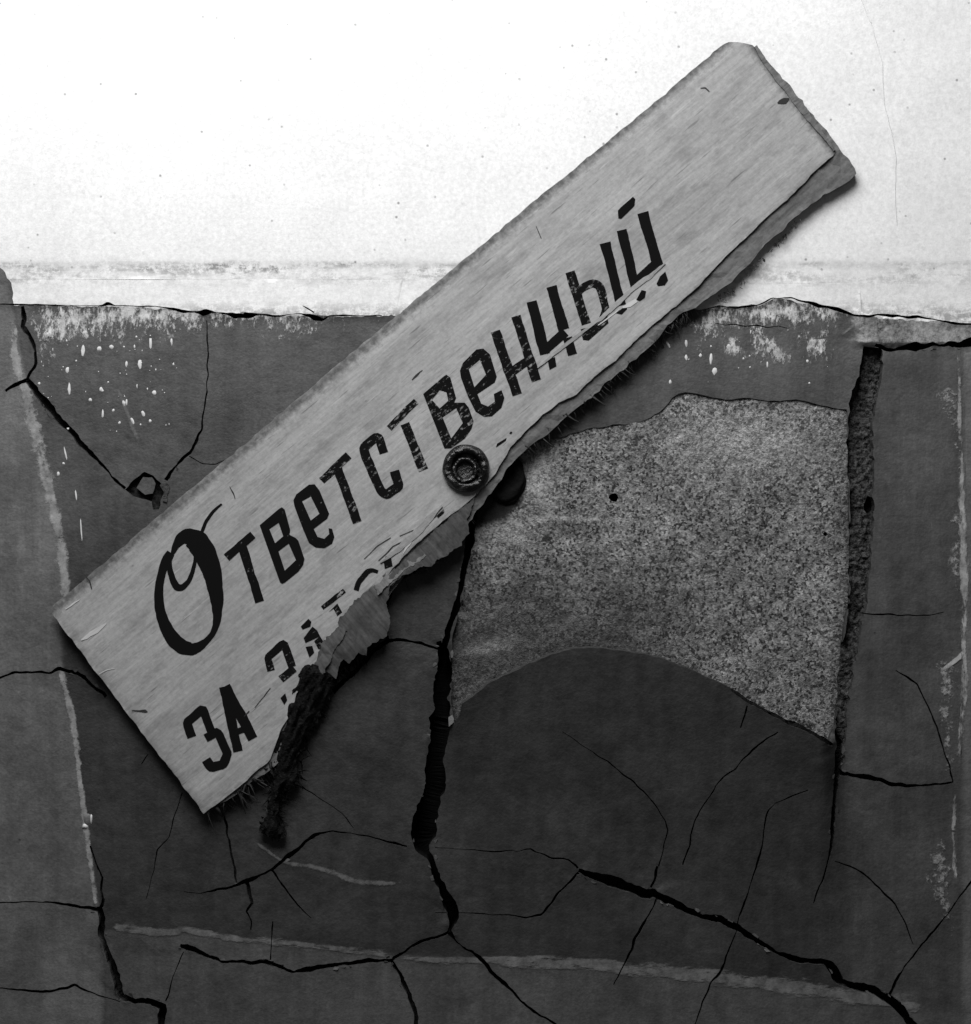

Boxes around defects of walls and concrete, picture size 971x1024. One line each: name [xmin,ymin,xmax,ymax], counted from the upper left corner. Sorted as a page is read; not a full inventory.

crack [0,302,382,489]
spalling [450,392,851,742]
crack [0,510,971,1024]